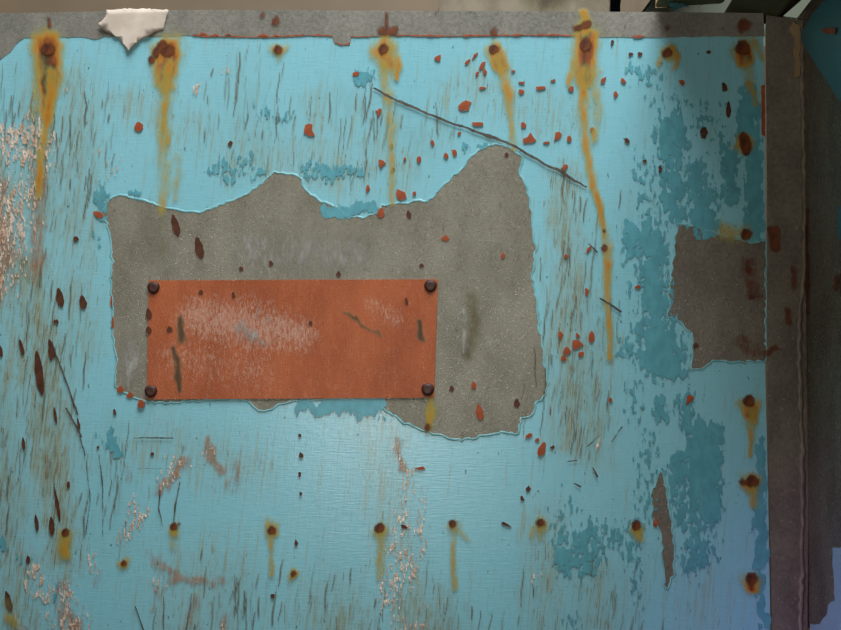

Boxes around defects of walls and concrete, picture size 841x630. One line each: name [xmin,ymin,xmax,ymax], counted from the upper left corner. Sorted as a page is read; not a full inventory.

corrosion [31,17,64,198]
corrosion [148,35,181,153]
peeling [353,67,375,87]
corrosion [370,12,402,204]
corrosion [485,28,516,150]
spalling [521,122,572,144]
corrosion [566,9,613,360]
spalling [56,288,64,307]
peeling [92,132,555,459]
peeling [547,52,767,609]
corrosion [739,395,761,457]
spalling [49,488,61,535]